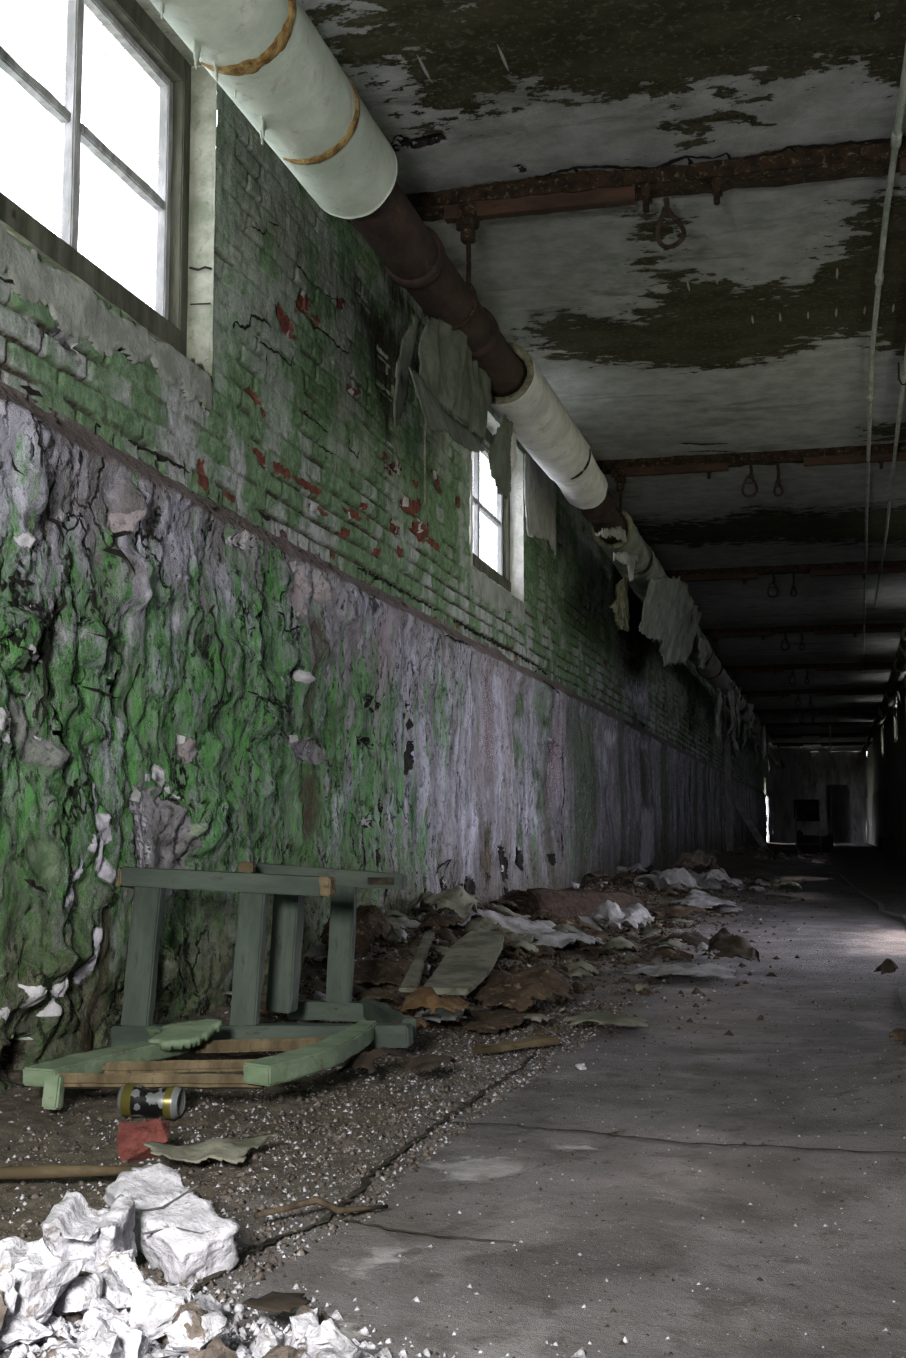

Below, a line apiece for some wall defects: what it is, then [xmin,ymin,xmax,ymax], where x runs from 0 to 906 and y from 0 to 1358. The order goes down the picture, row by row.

peeling [305,0,906,153]
flaking render [275,289,320,339]
peeling [506,186,906,375]
crack [94,423,220,502]
flaking render [247,445,368,539]
flaking render [380,451,460,558]
crack [5,385,146,744]
damp [125,577,152,638]
damp [65,782,117,912]
damp [74,927,103,985]
peeling [0,976,69,1087]
crack [190,1048,906,1291]